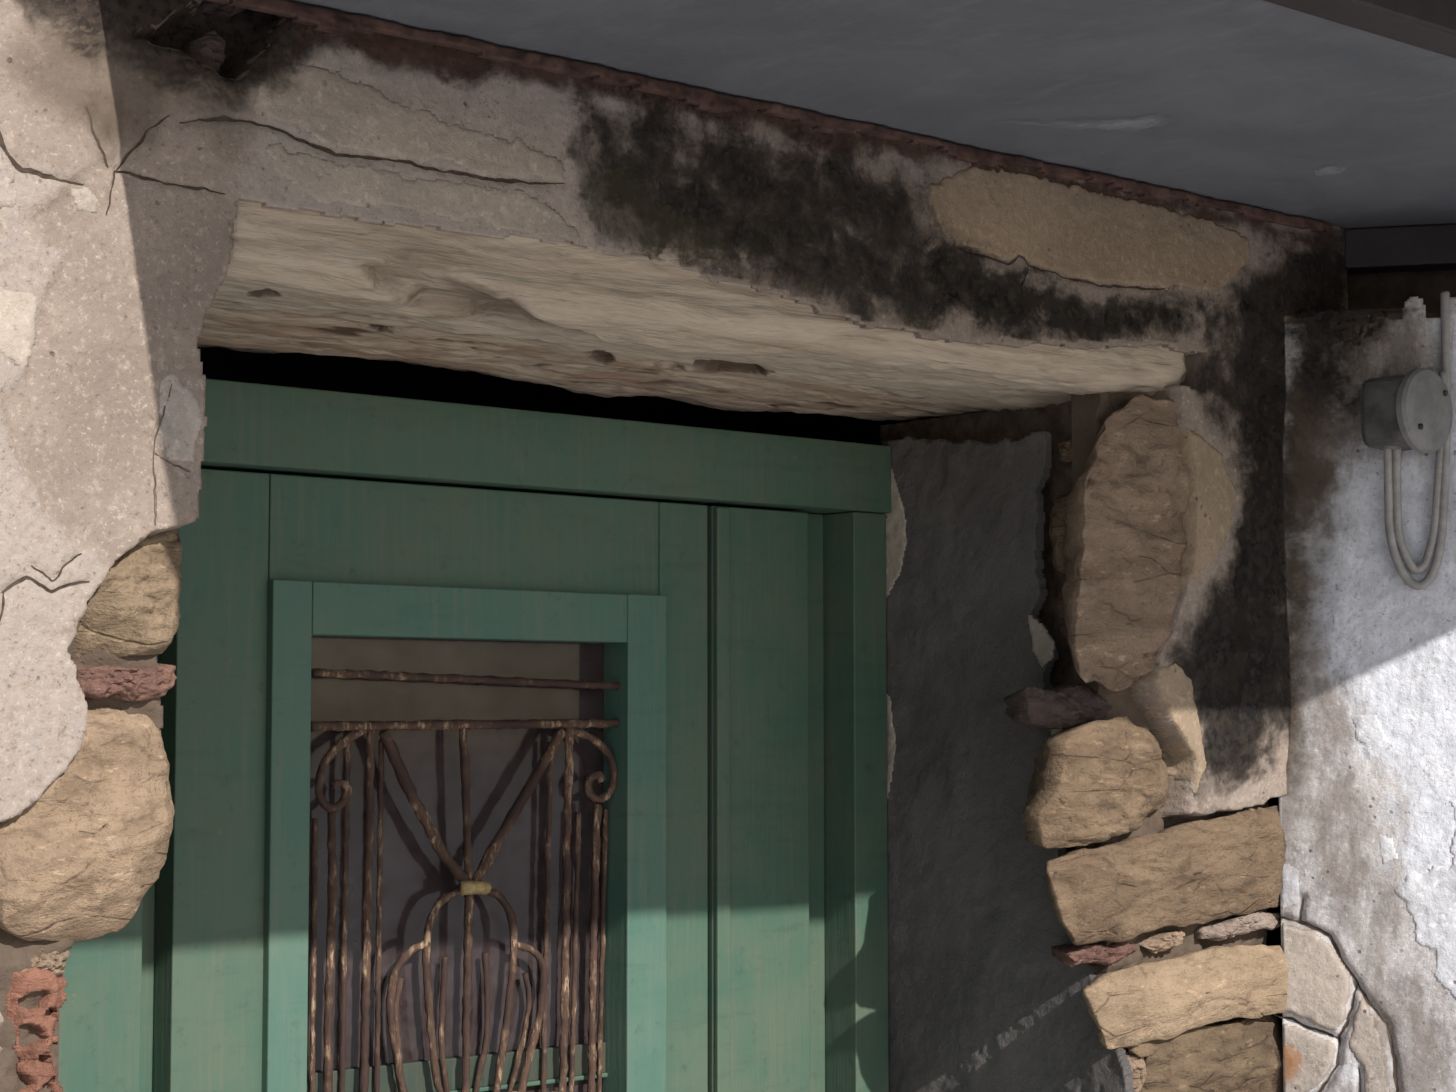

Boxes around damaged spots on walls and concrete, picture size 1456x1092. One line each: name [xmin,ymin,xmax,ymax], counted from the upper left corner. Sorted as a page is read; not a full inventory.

water stain [19,0,327,100]
crack [0,105,565,215]
crack [153,384,191,525]
water stain [568,91,1407,786]
crack [0,553,90,621]
flaking render [0,529,182,1092]
flaking render [1003,393,1300,1092]
crack [1273,898,1399,1092]
peeling [1352,715,1388,752]
peeling [1379,800,1456,1000]